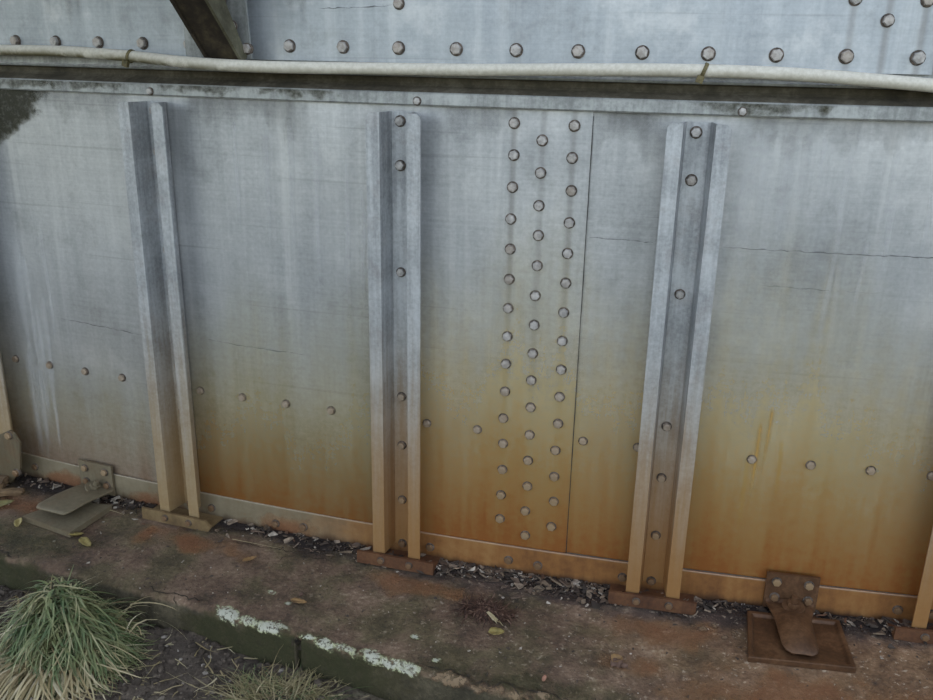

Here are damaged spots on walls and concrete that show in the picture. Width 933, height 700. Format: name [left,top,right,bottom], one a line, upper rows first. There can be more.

leakage [0,89,45,140]
corrosion [196,396,373,523]
corrosion [420,361,640,561]
corrosion [683,400,933,596]